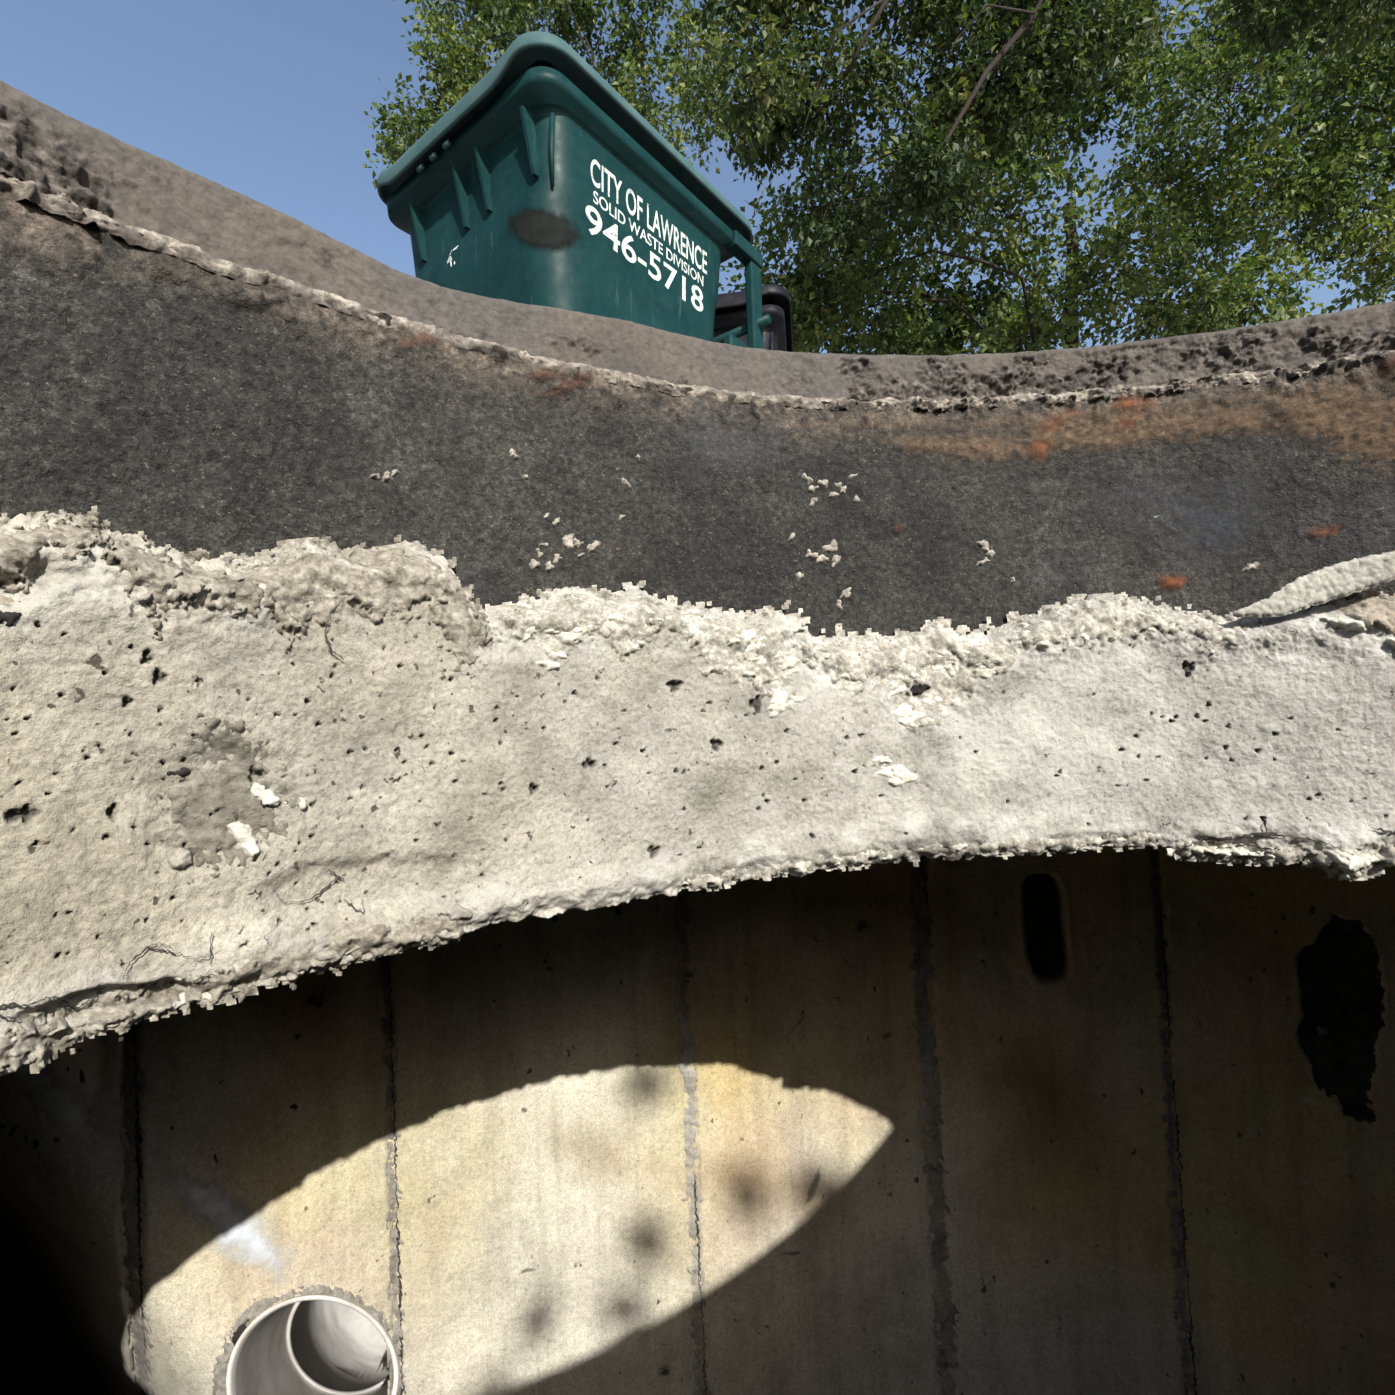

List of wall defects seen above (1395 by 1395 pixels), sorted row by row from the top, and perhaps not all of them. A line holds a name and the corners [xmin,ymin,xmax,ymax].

rust [916,397,1261,456]
spalling [0,506,1263,736]